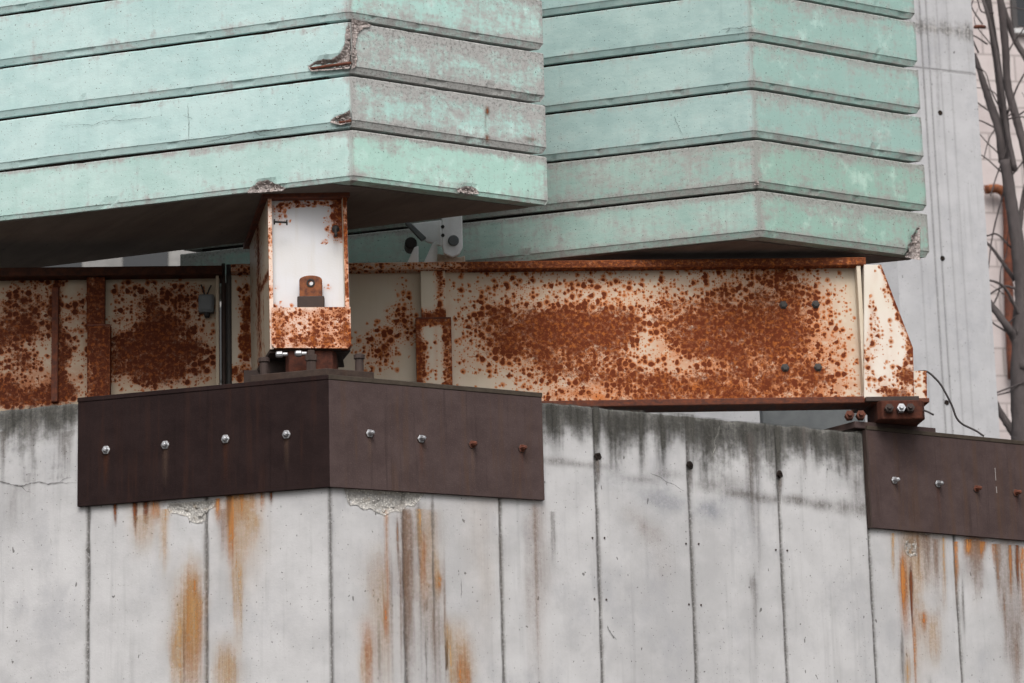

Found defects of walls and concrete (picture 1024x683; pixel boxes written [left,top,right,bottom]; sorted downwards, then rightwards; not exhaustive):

spalling [308,18,371,71]
spalling [330,110,352,125]
spalling [248,180,285,193]
spalling [905,227,921,260]
damp [546,403,644,455]
damp [659,413,722,468]
damp [741,422,858,489]
spalling [167,500,217,523]
spalling [345,489,424,515]
rust [216,492,272,591]
rust [892,533,1024,680]